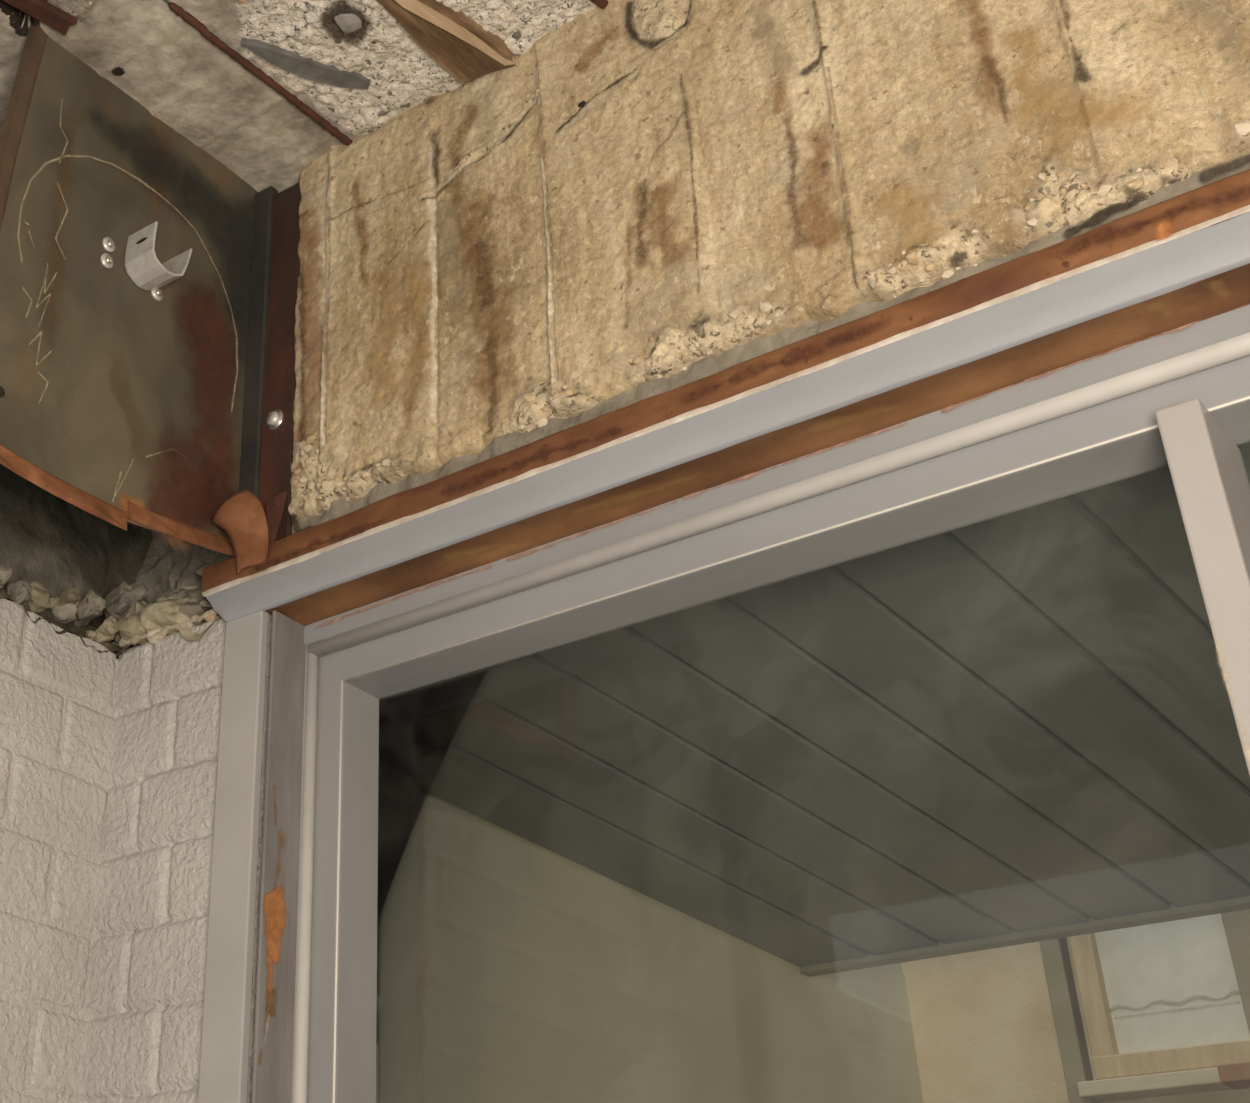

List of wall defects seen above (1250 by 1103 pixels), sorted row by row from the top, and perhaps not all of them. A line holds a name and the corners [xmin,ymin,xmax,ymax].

spalling [233,0,463,136]
spalling [436,0,597,57]
damp [576,29,616,71]
crack [556,1,691,134]
crack [802,0,827,74]
crack [332,88,541,263]
rust [775,93,843,246]
spalling [1010,159,1193,237]
rust [0,158,1250,593]
spalling [202,205,1250,597]